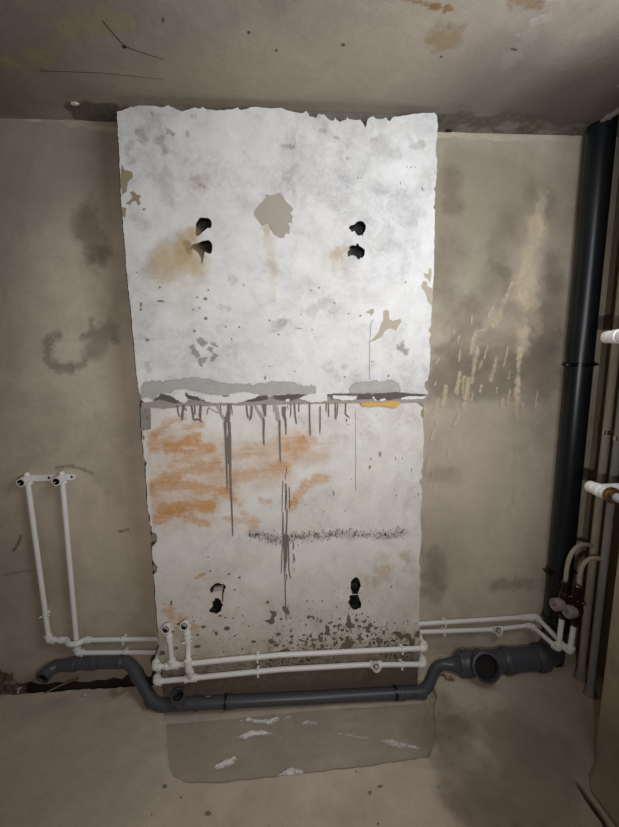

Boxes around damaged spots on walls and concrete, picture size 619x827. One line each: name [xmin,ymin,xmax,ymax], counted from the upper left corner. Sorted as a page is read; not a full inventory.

peeling [254,192,293,238]
peeling [359,309,401,342]
leakage [424,204,546,440]
leakage [177,404,233,536]
leakage [246,403,404,621]
leakage [393,631,420,646]